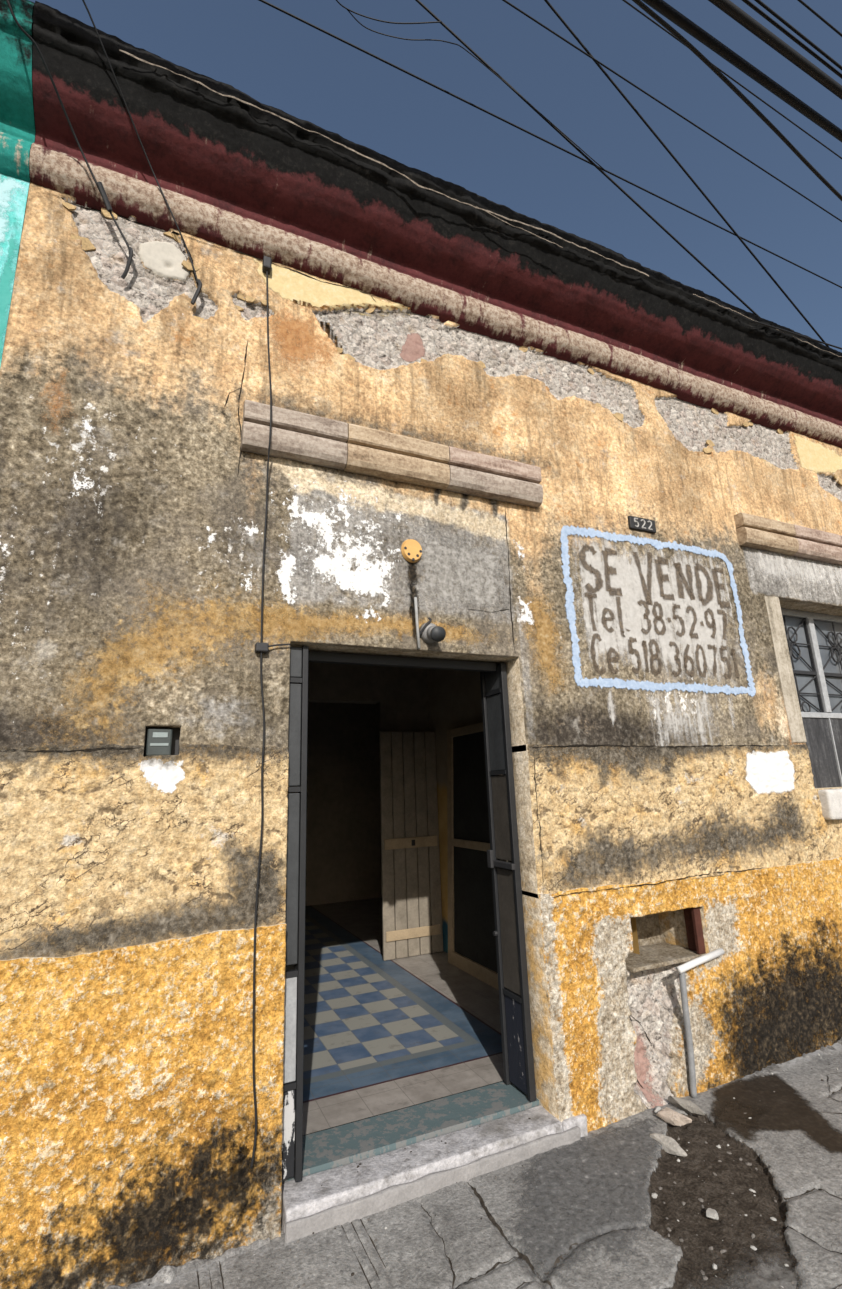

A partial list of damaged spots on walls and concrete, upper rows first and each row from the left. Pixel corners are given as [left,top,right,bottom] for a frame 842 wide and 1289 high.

flaking render [62,198,842,502]
peeling [238,473,408,623]
peeling [518,599,534,625]
crack [421,1181,643,1289]
crack [763,1186,842,1289]